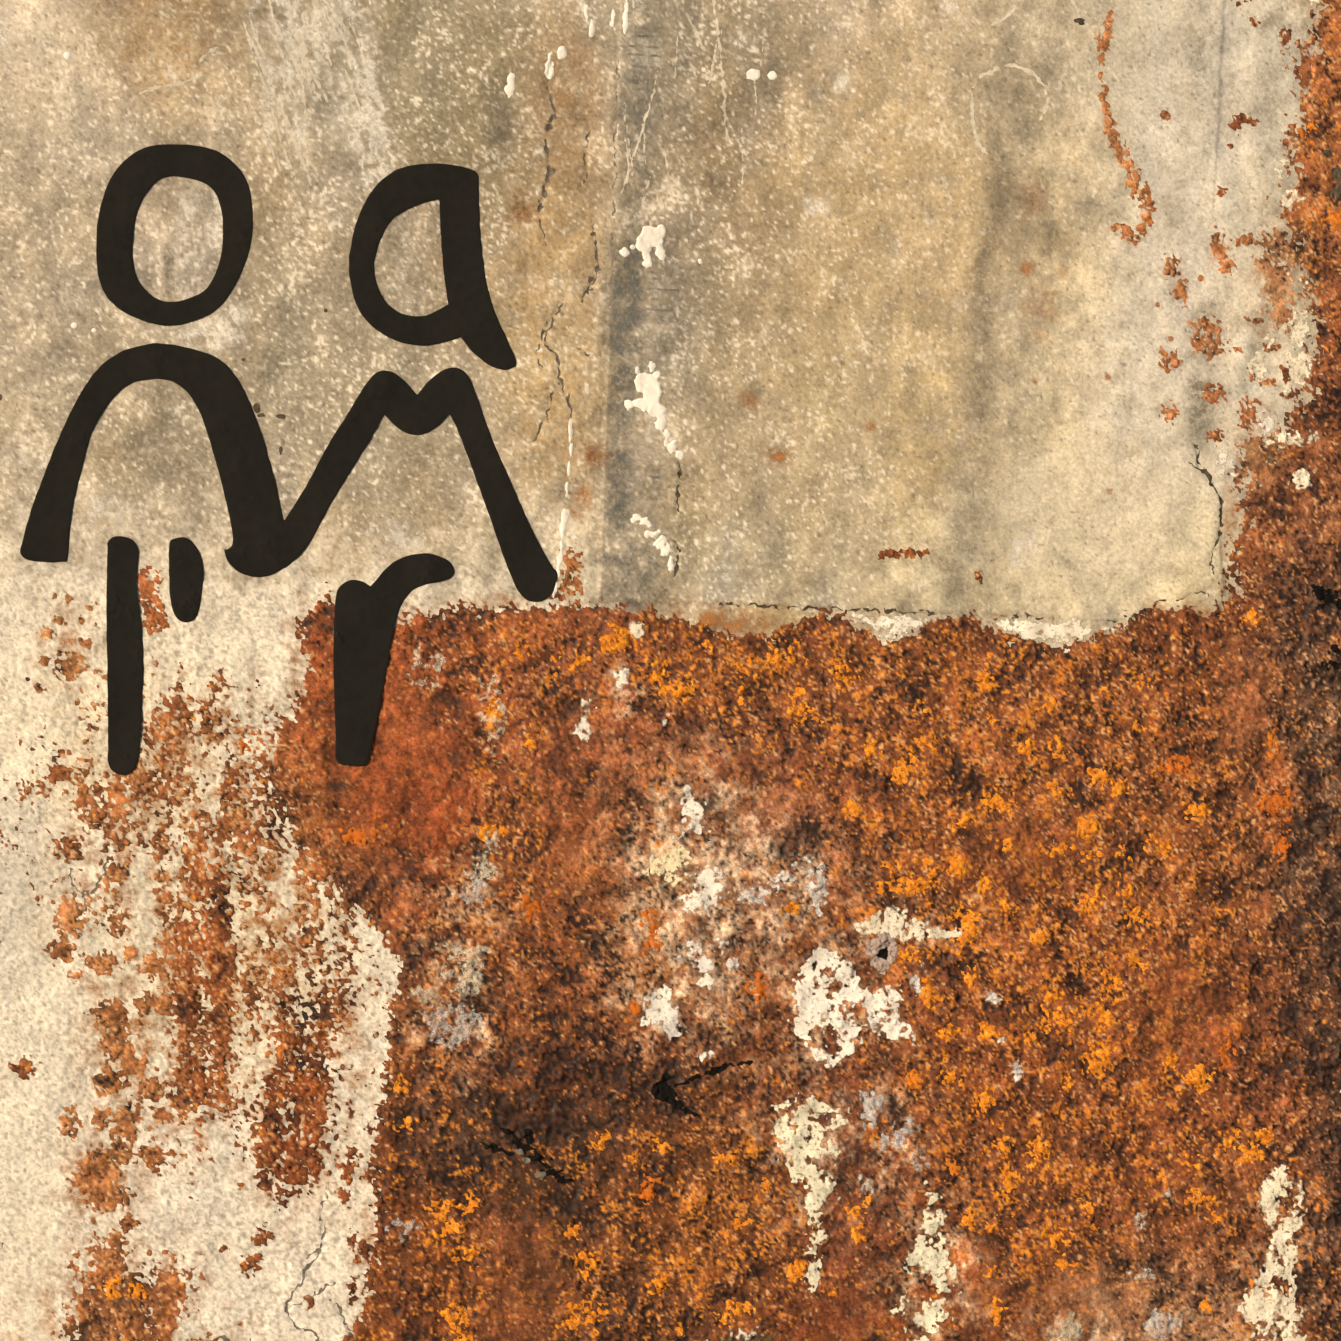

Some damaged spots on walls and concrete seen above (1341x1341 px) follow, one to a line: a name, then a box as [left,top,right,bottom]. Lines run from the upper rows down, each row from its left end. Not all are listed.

rust [1092,10,1157,246]
crack [533,48,620,441]
rust [1156,253,1243,374]
crack [1107,443,1224,625]
rust [137,565,170,635]
crack [719,602,951,617]
crack [993,612,1043,621]
rust [36,614,107,690]
rust [67,948,123,982]
rust [8,1055,43,1080]
rust [329,1143,364,1209]
rust [219,1222,275,1279]